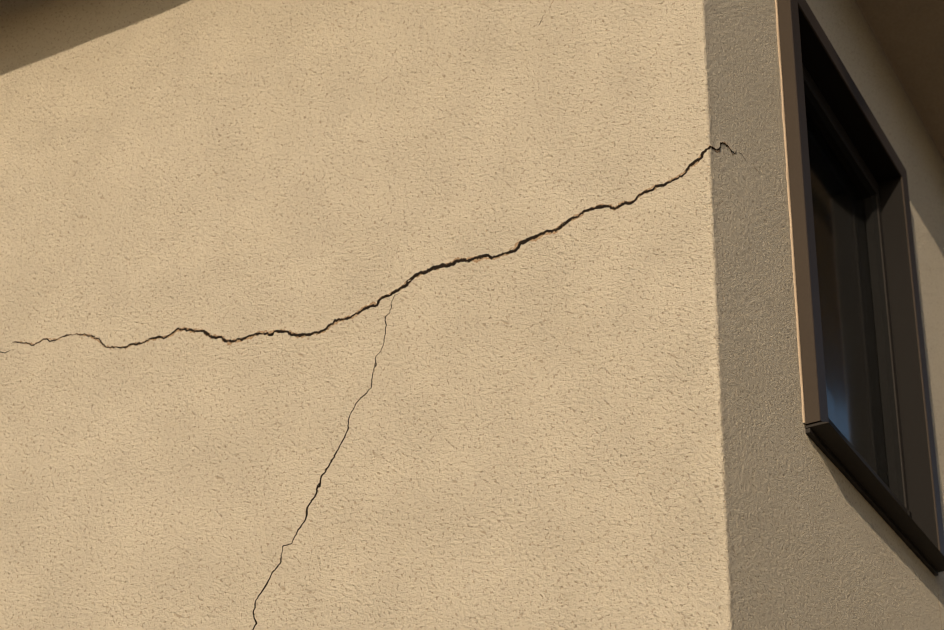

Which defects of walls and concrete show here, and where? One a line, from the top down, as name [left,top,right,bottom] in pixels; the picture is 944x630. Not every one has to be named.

crack [0,141,760,630]